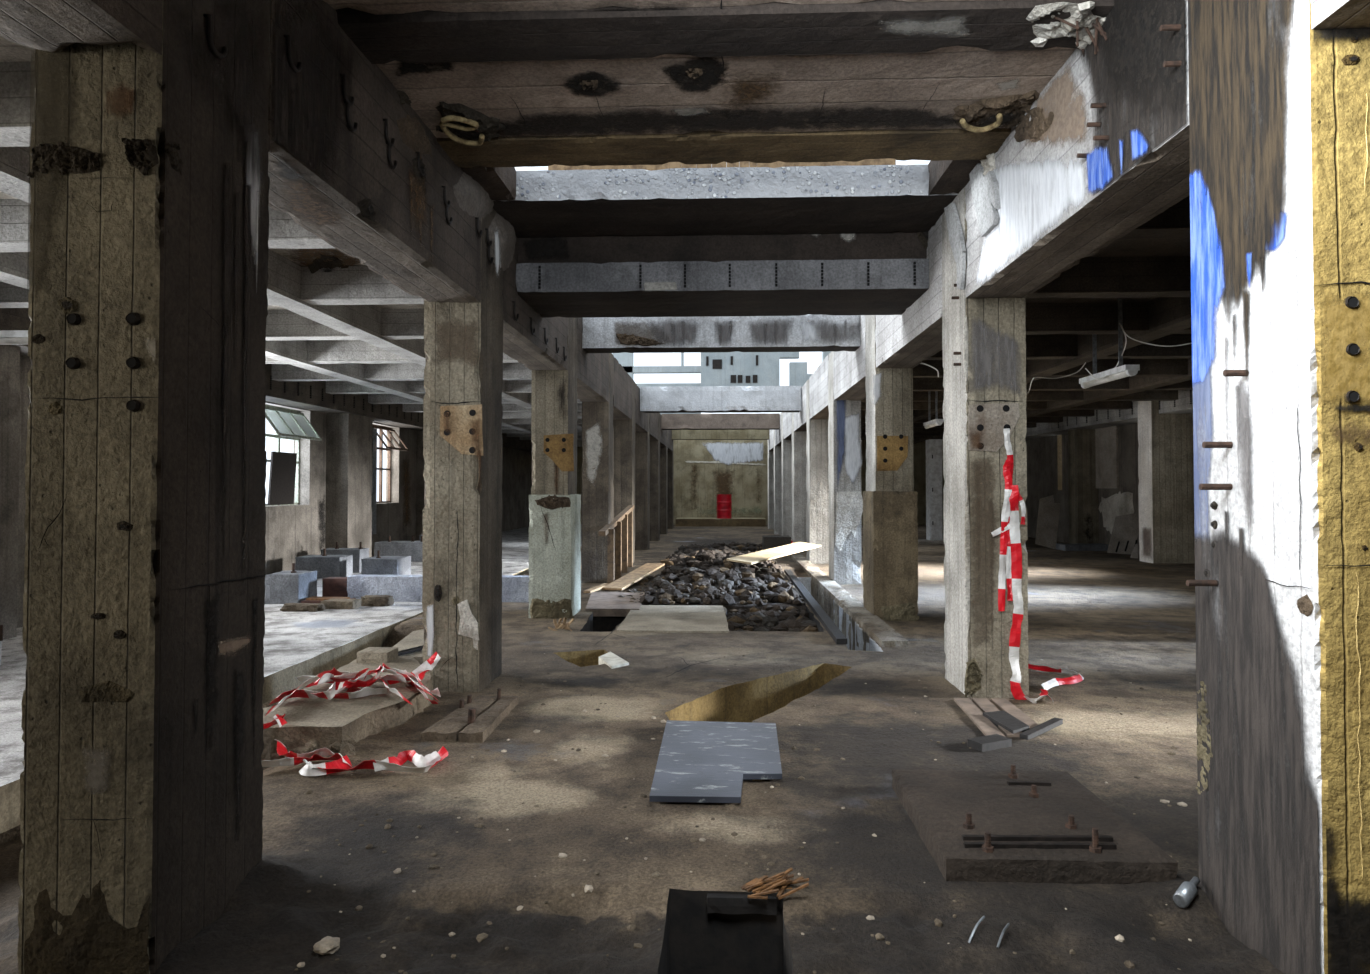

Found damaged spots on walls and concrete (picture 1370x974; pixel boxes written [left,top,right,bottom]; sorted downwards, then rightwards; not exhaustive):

spalling [1026,1,1107,57]
water stain [564,71,619,97]
water stain [663,57,780,115]
spalling [27,141,101,178]
spalling [121,138,159,176]
spalling [24,880,150,974]